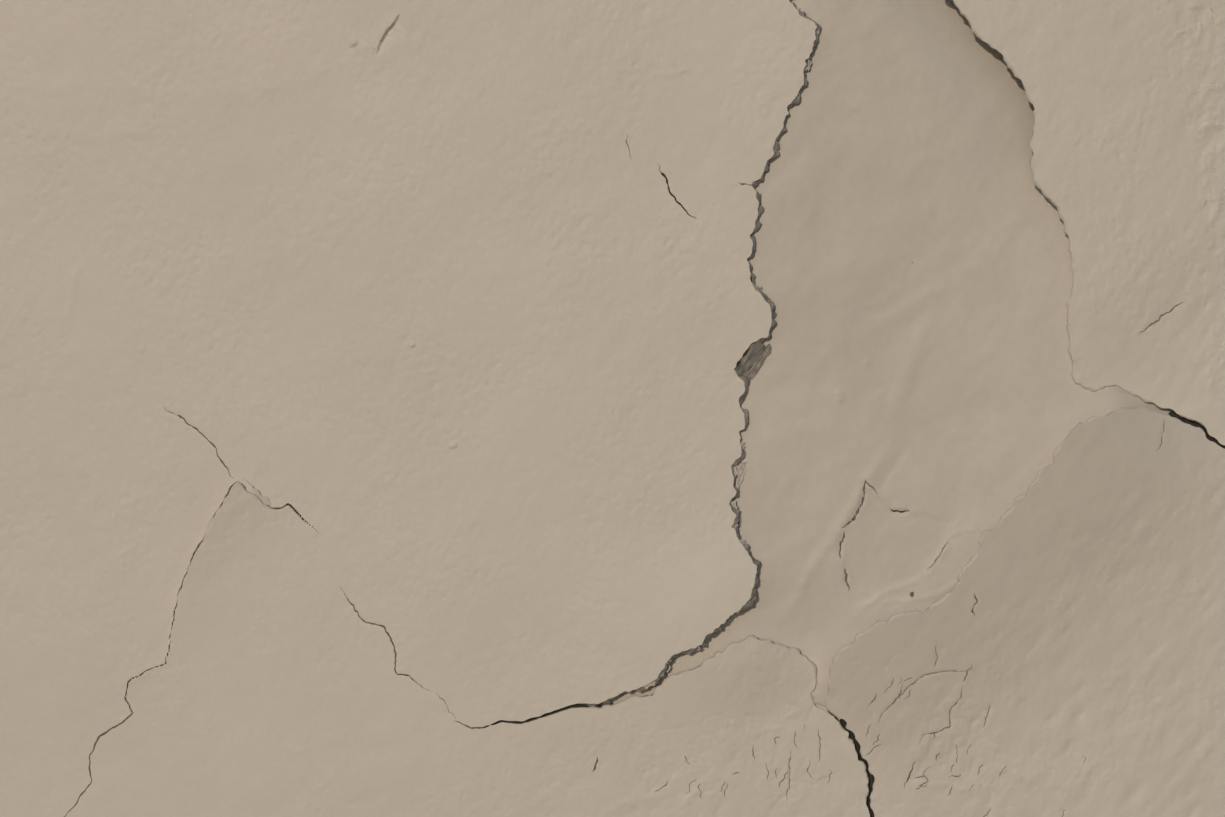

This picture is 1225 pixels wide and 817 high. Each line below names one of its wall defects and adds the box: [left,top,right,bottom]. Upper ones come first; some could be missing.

crack [164,407,233,478]
peeling [438,0,1225,817]
crack [1157,410,1225,450]
crack [341,589,600,729]
crack [655,643,1005,817]